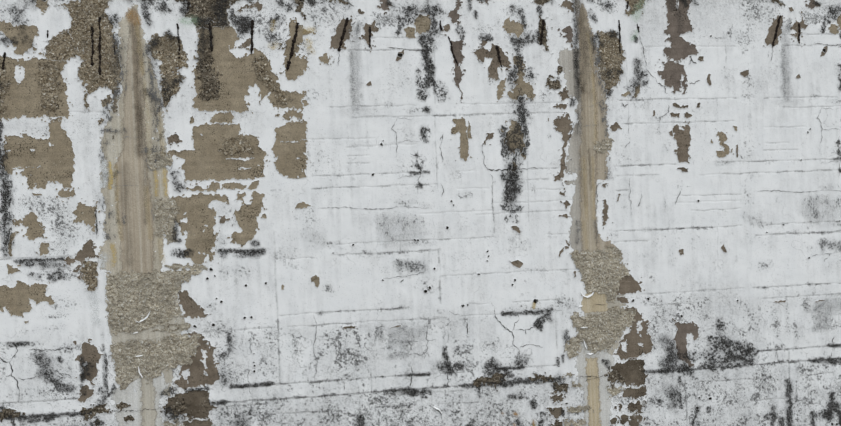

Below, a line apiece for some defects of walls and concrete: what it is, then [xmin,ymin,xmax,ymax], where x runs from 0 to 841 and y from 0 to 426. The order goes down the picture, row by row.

damp [1,0,34,45]
damp [499,5,541,223]
peeling [655,0,704,172]
peeling [710,125,739,162]
damp [0,112,69,281]
peeling [0,0,397,426]
peeling [403,0,654,426]
crack [0,344,78,402]
crack [494,307,540,360]
peeling [671,313,701,369]
damp [642,319,759,409]